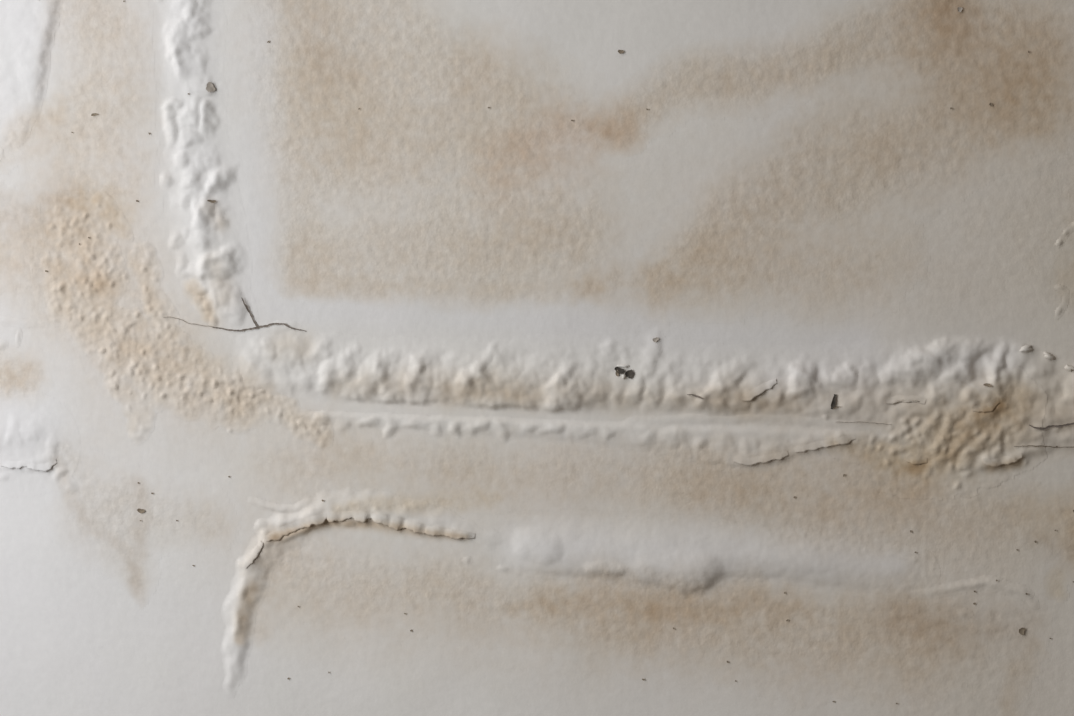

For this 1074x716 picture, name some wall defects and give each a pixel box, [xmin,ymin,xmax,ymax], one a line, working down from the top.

leakage [225,0,1074,327]
crack [163,298,305,331]
leakage [255,526,1055,716]